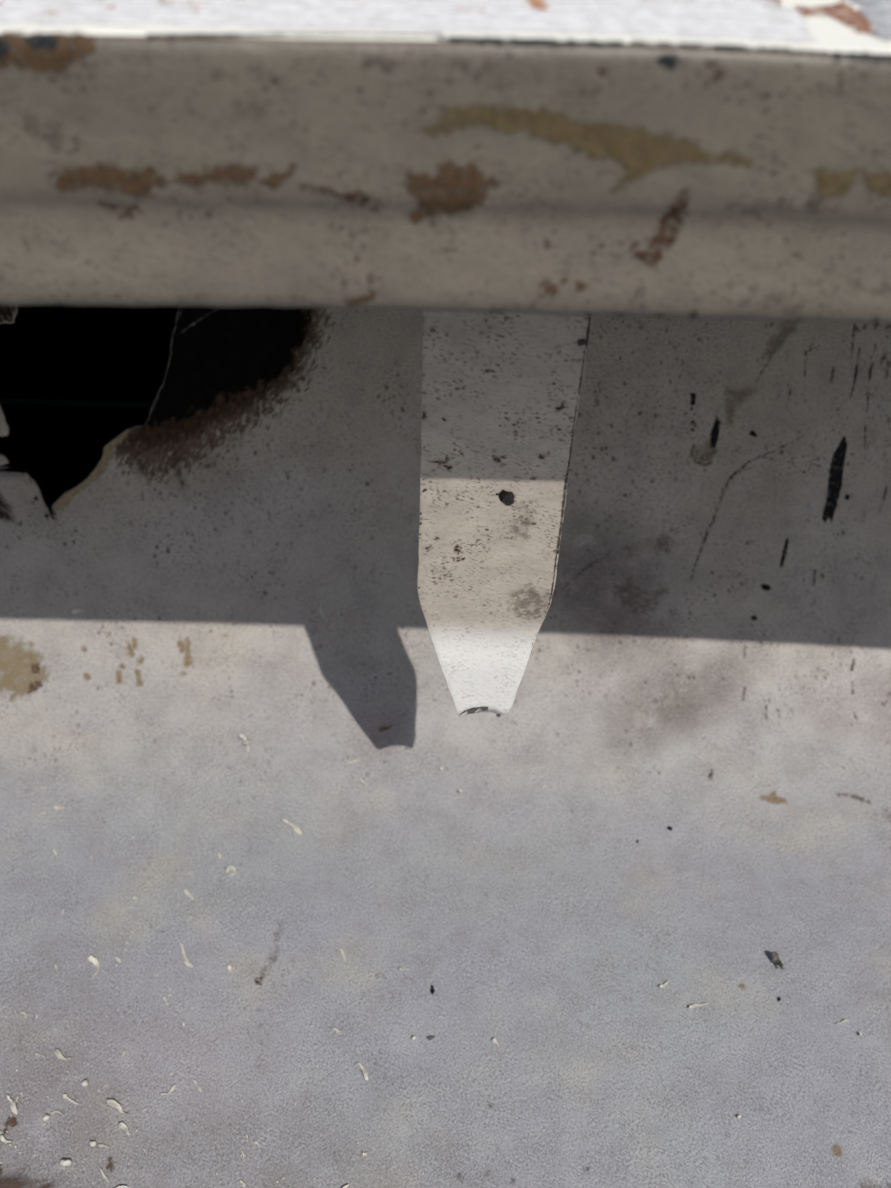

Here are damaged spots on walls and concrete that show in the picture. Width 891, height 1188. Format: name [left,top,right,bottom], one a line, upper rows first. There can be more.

peeling [0,0,891,81]
corrosion [50,163,296,218]
corrosion [406,157,498,224]
corrosion [629,189,690,267]
crack [690,437,802,580]